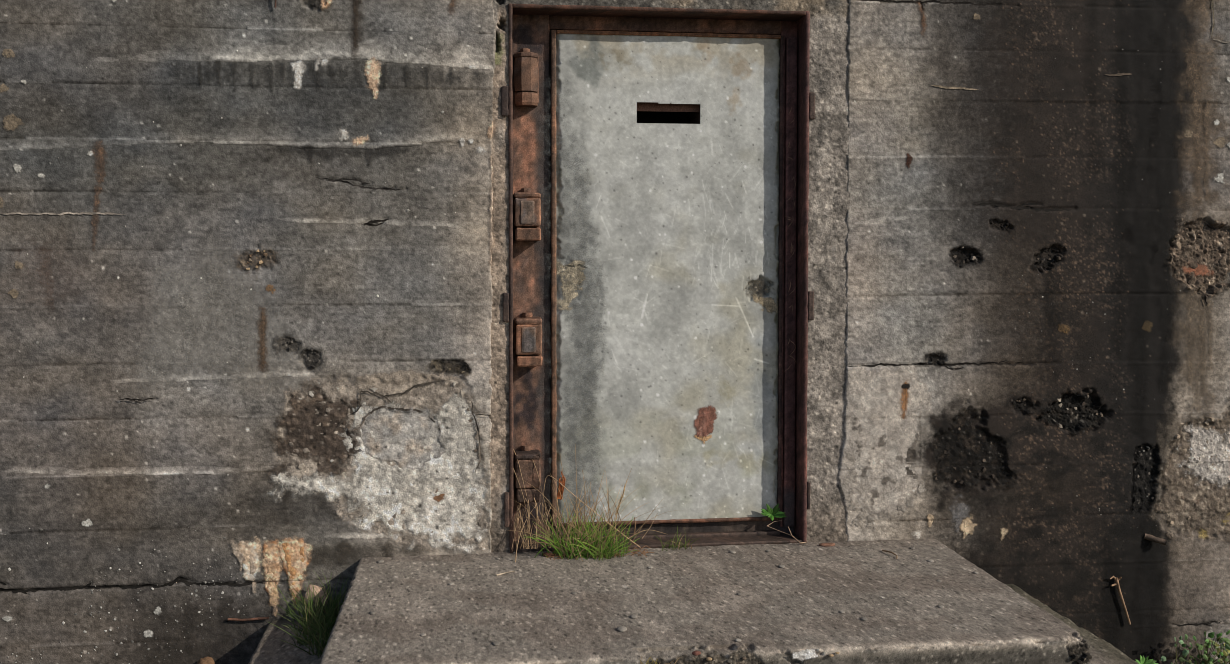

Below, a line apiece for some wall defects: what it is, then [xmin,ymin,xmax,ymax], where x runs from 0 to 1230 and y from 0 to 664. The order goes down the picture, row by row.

spalling [305,0,331,9]
spalling [950,246,983,268]
spalling [1168,217,1230,297]
spalling [749,279,778,313]
damp [914,0,1228,664]
spalling [269,335,492,553]
crack [332,381,443,432]
crack [470,400,491,472]
corrosion [694,406,717,443]
spalling [1012,394,1107,435]
spalling [1132,398,1230,542]
crack [0,576,266,594]